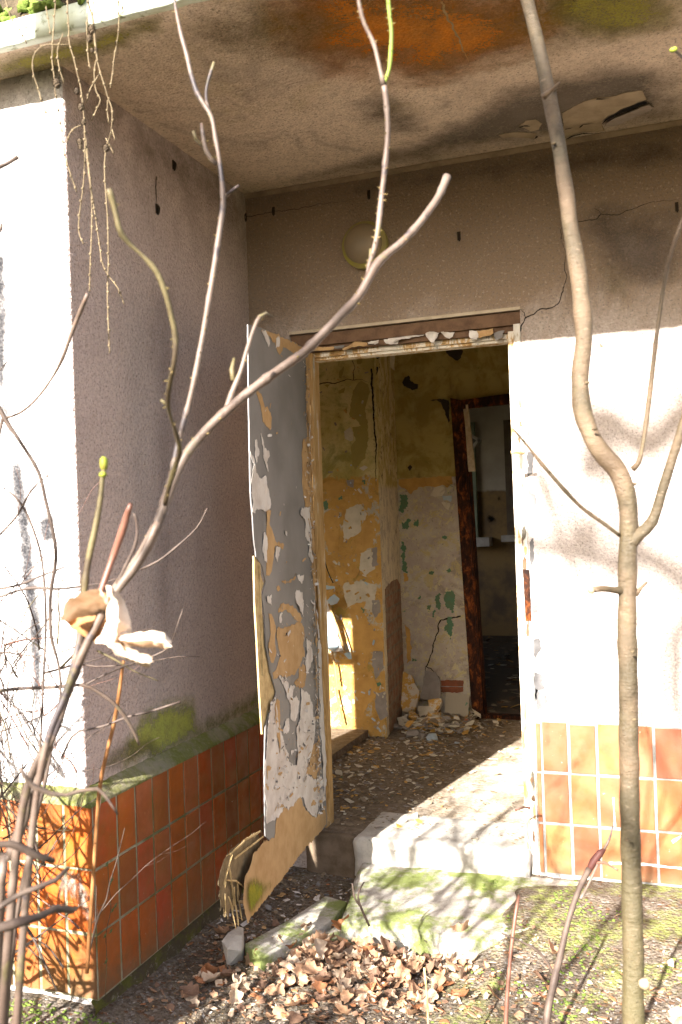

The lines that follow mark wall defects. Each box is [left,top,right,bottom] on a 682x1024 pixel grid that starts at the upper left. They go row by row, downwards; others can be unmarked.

corrosion [302,0,514,69]
flaking render [562,90,654,139]
crack [520,200,672,331]
peeling [469,328,505,341]
crack [319,357,379,479]
peeling [250,432,281,515]
peeling [262,332,464,824]
crack [425,615,461,672]